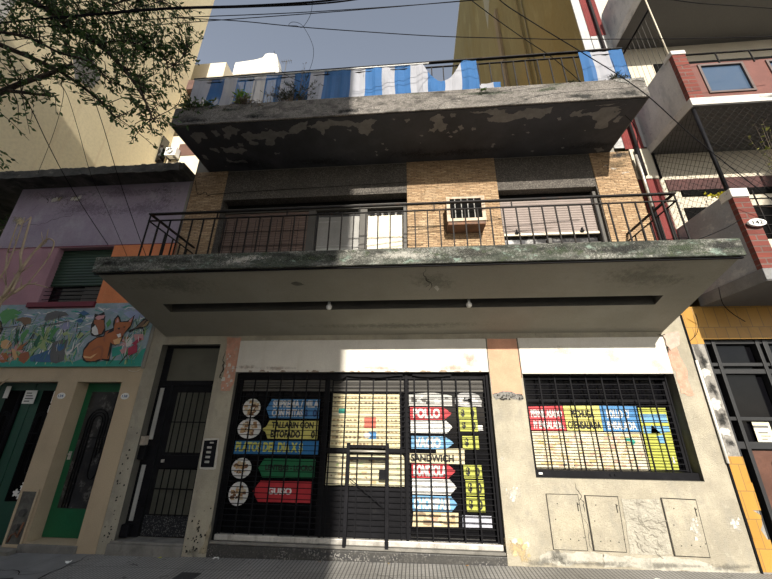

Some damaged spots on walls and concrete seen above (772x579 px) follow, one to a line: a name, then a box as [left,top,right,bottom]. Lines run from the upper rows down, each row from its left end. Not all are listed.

peeling [190,119,377,167]
peeling [420,113,476,138]
peeling [472,103,626,131]
peeling [221,337,241,391]
peeling [657,331,694,396]